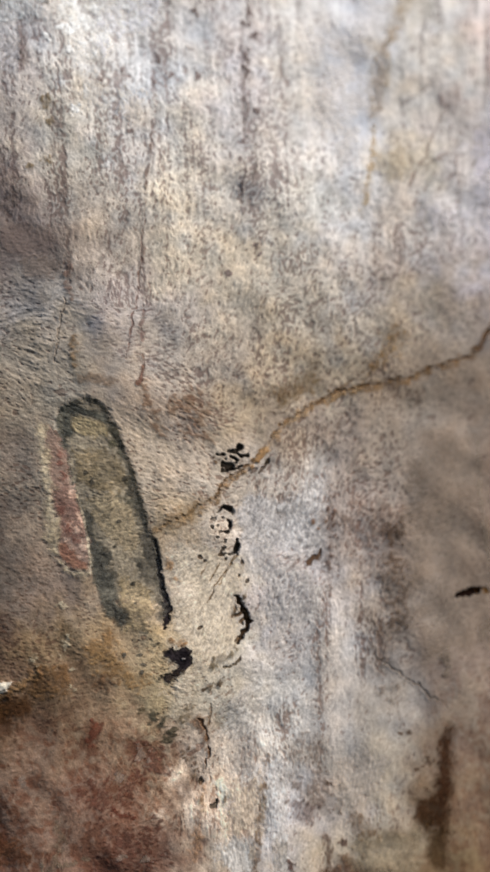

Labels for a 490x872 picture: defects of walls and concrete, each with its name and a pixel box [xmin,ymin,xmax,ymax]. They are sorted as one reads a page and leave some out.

crack [215,329,490,499]
spalling [213,444,269,474]
spalling [218,505,244,564]
spalling [455,587,490,598]